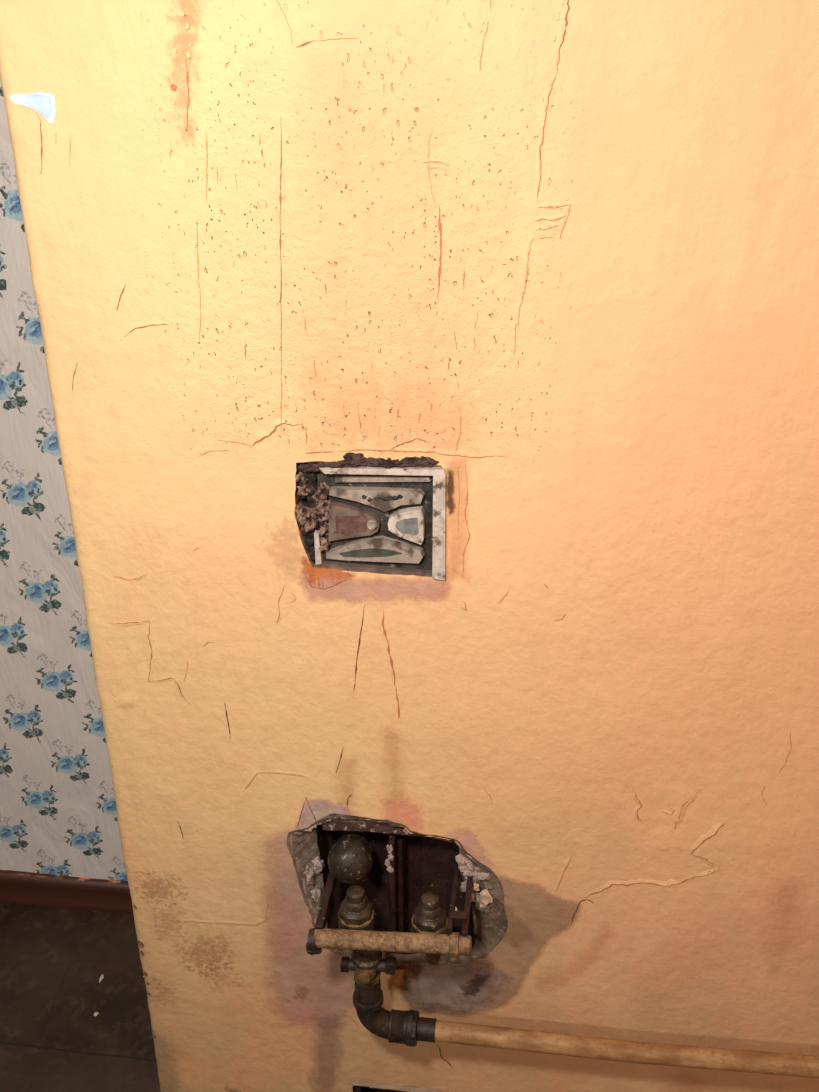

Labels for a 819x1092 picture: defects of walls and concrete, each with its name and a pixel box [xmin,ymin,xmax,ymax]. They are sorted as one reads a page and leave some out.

crack [277,0,359,47]
crack [509,0,571,355]
crack [201,116,508,611]
spalling [295,471,332,552]
corrosion [302,559,352,589]
crack [108,620,213,705]
crack [354,604,400,719]
crack [555,789,724,925]
peeling [270,800,508,1092]